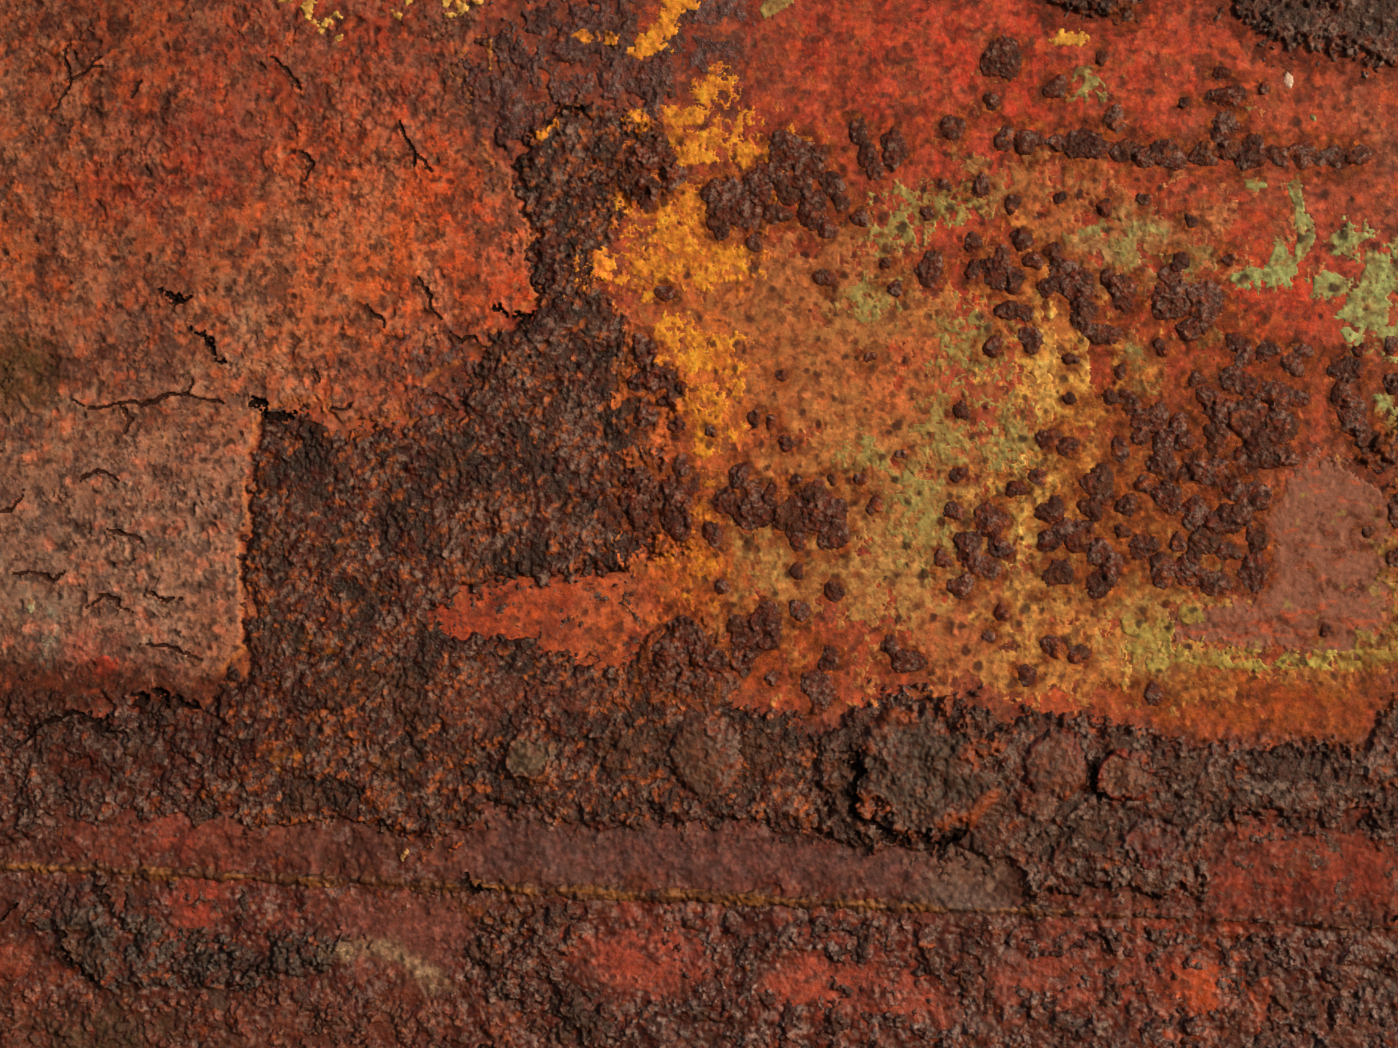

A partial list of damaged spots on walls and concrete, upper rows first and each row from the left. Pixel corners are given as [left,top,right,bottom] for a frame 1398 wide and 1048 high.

crack [51,44,103,112]
peeling [535,119,559,141]
peeling [572,0,701,60]
peeling [759,0,794,19]
rust [697,110,916,257]
rust [928,34,1373,184]
crack [79,468,120,483]
crack [72,286,353,449]
peeling [564,61,1398,718]
rust [871,168,1398,648]
crack [12,569,66,583]
rust [0,858,1212,1048]